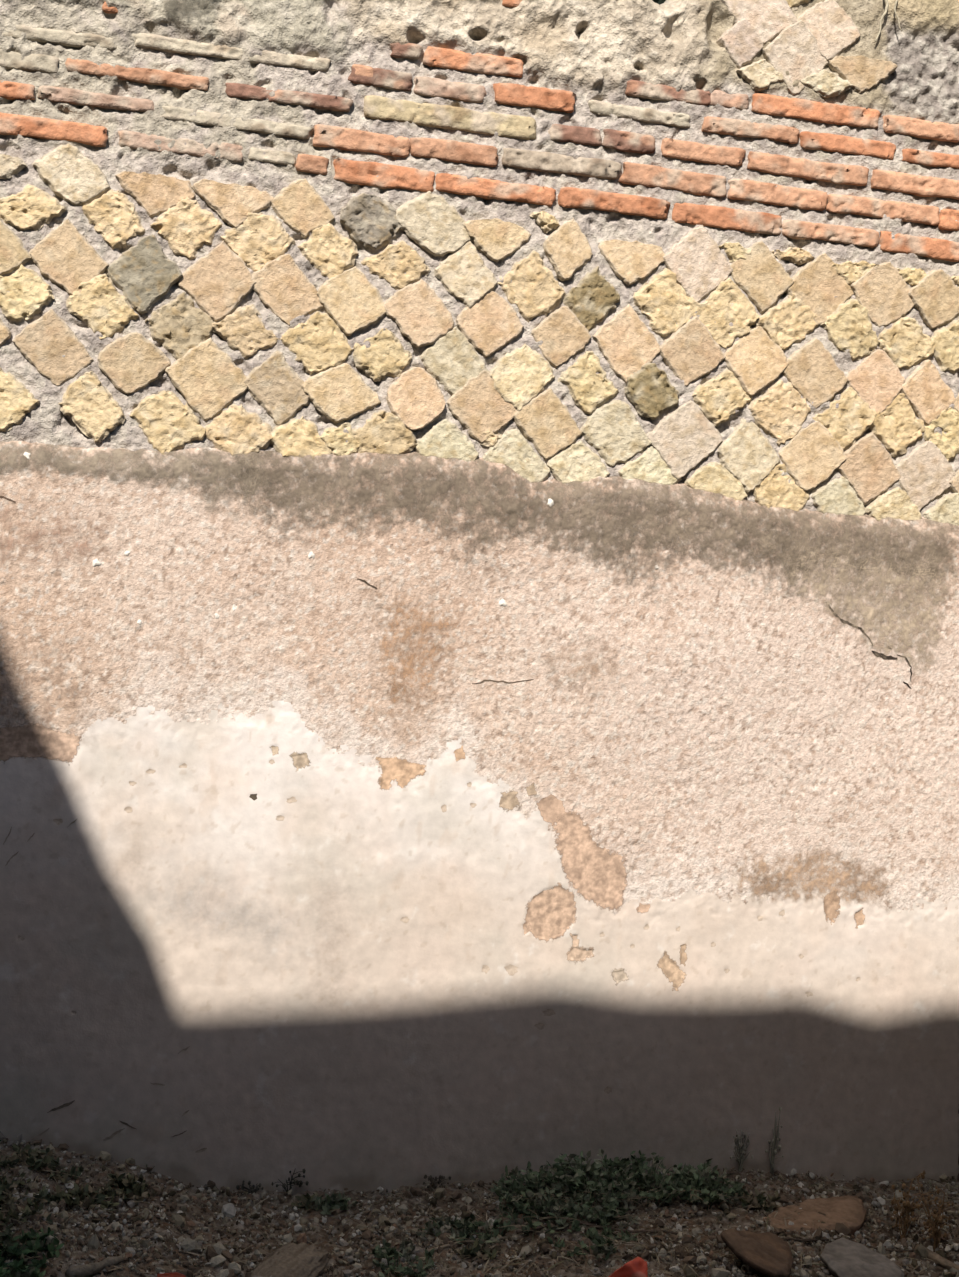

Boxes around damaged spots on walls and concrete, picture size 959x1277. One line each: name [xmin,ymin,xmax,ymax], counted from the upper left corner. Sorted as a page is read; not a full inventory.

damp [0,441,959,667]
crack [829,605,912,688]
crack [472,677,534,685]
peeling [0,723,81,763]
spalling [269,746,310,771]
peeling [376,757,425,790]
peeling [454,745,465,761]
peeling [499,783,650,962]
spalling [824,890,865,928]
spalling [612,968,628,985]
spalling [657,926,687,991]